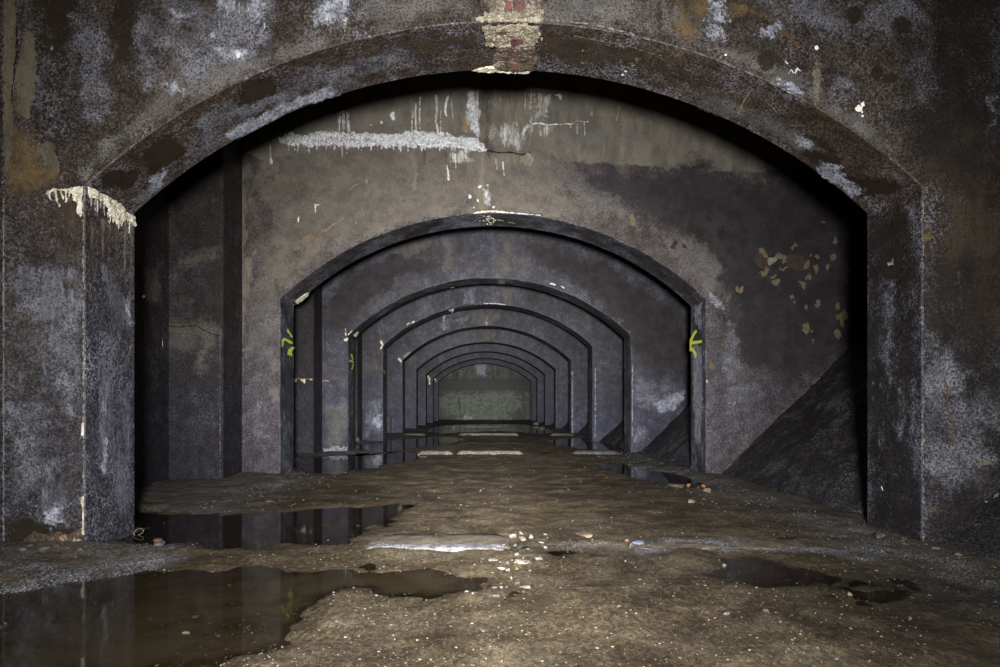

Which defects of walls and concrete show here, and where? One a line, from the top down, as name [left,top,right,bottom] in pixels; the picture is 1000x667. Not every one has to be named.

spalling [472,0,634,74]
water stain [8,0,330,421]
water stain [96,47,1000,542]
peeling [755,237,838,310]
peeling [834,302,849,339]